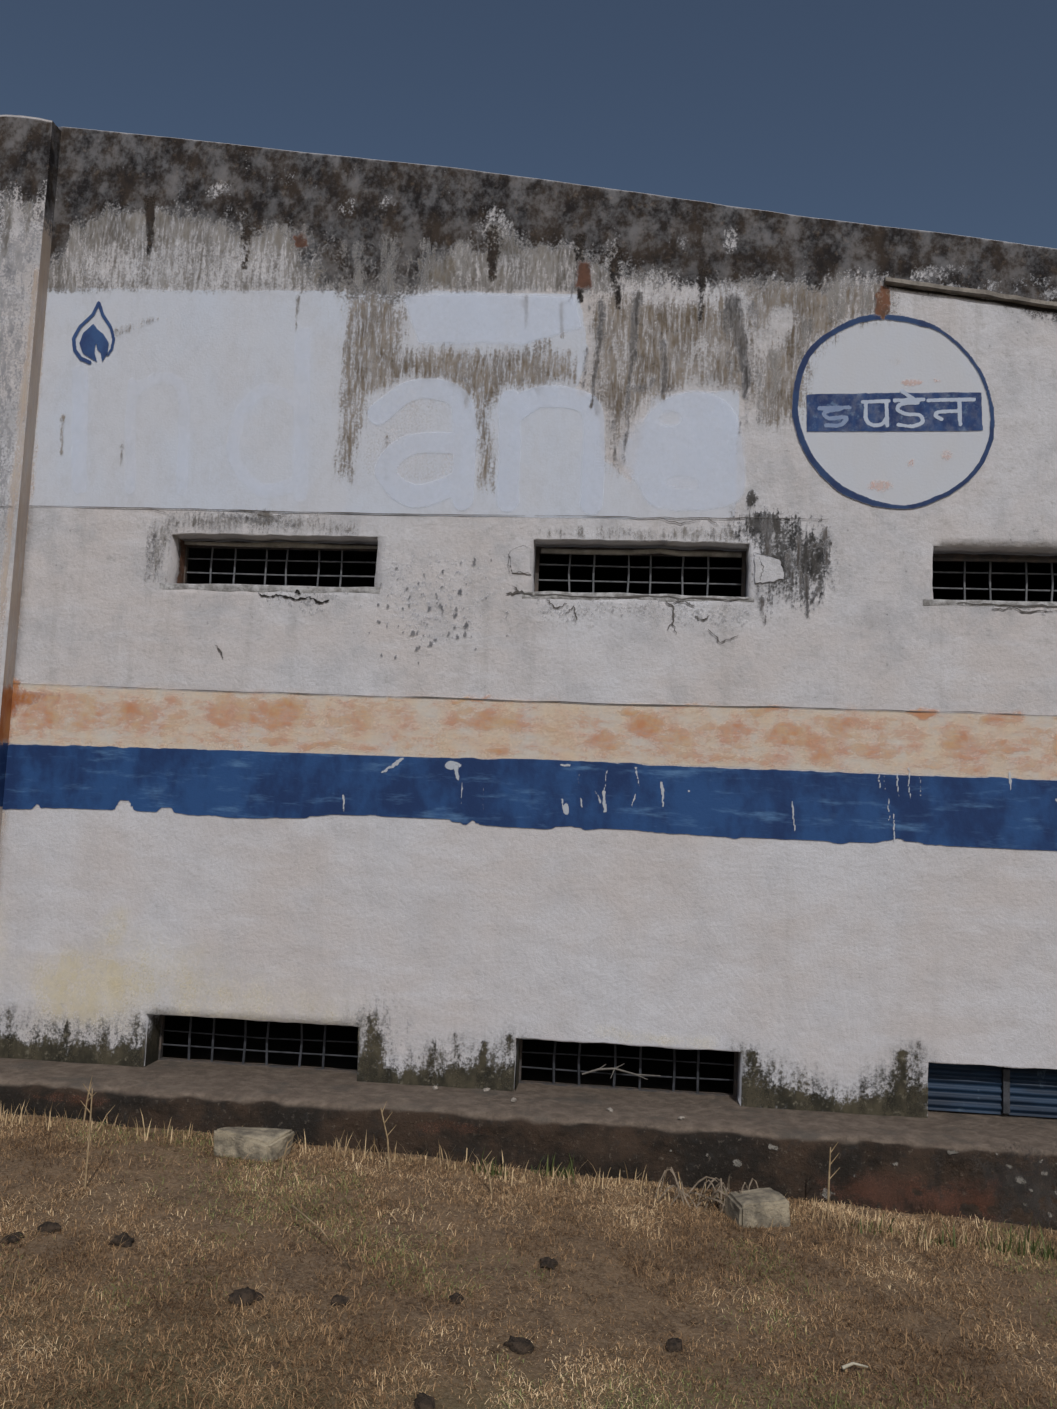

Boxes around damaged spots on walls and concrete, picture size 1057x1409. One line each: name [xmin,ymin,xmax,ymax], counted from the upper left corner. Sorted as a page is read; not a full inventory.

leakage [0,116,1057,533]
rust [571,261,592,310]
leakage [145,511,355,581]
leakage [540,489,838,624]
peeling [12,691,412,773]
peeling [431,685,1057,841]
leakage [0,1009,161,1067]
leakage [356,1007,520,1091]
leakage [740,1044,928,1118]